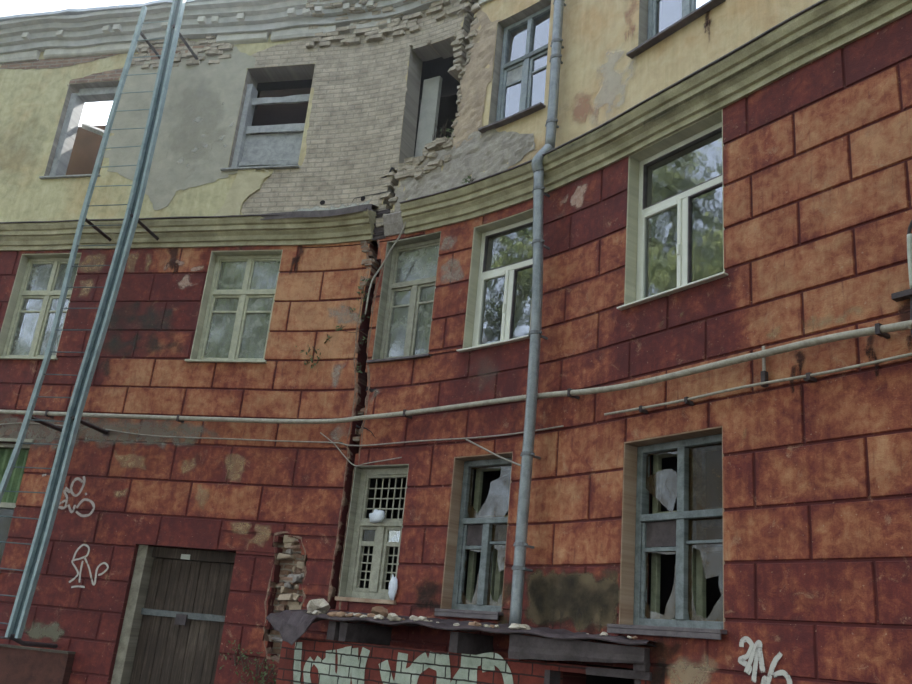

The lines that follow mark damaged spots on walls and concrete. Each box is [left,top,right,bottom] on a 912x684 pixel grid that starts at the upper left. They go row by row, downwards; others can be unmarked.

flaking render [0,53,122,70]
flaking render [67,45,162,181]
flaking render [145,0,535,216]
crack [448,0,481,83]
crack [327,167,405,610]
spalling [233,523,308,663]
damp [525,570,620,631]